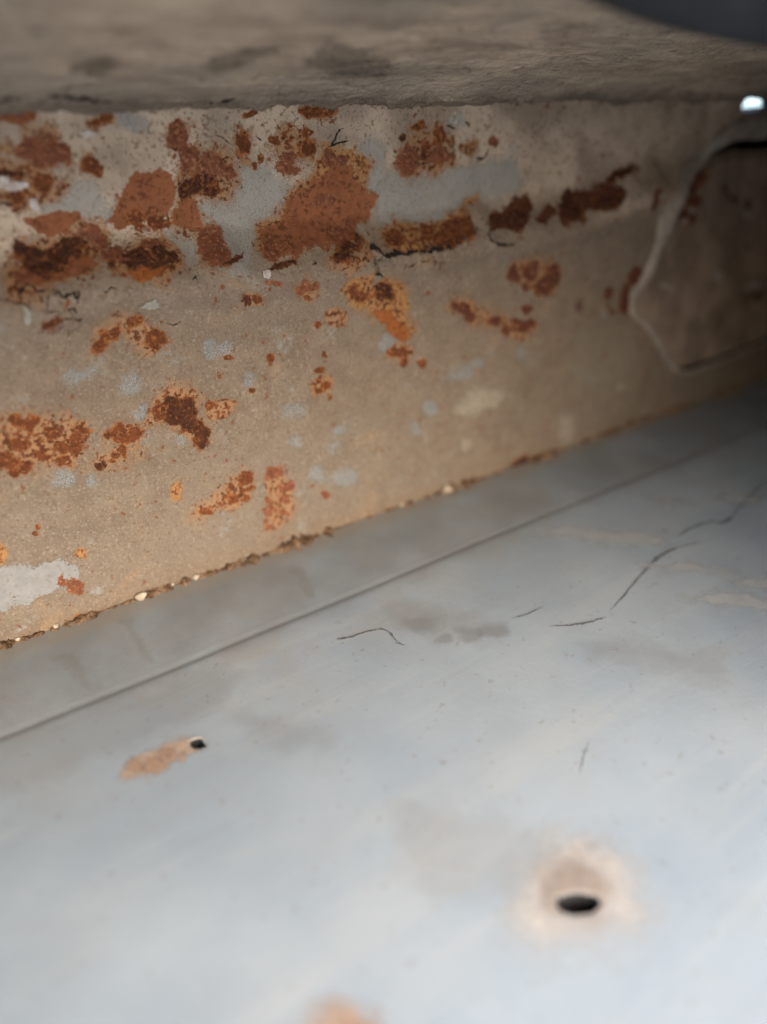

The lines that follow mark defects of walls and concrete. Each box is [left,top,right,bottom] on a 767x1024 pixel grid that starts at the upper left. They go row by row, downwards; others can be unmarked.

corrosion [0,105,643,369]
crack [369,223,516,288]
corrosion [308,351,336,401]
corrosion [0,374,241,486]
corrosion [168,461,299,536]
crack [514,480,766,626]
crack [337,628,404,645]
corrosion [118,737,203,780]